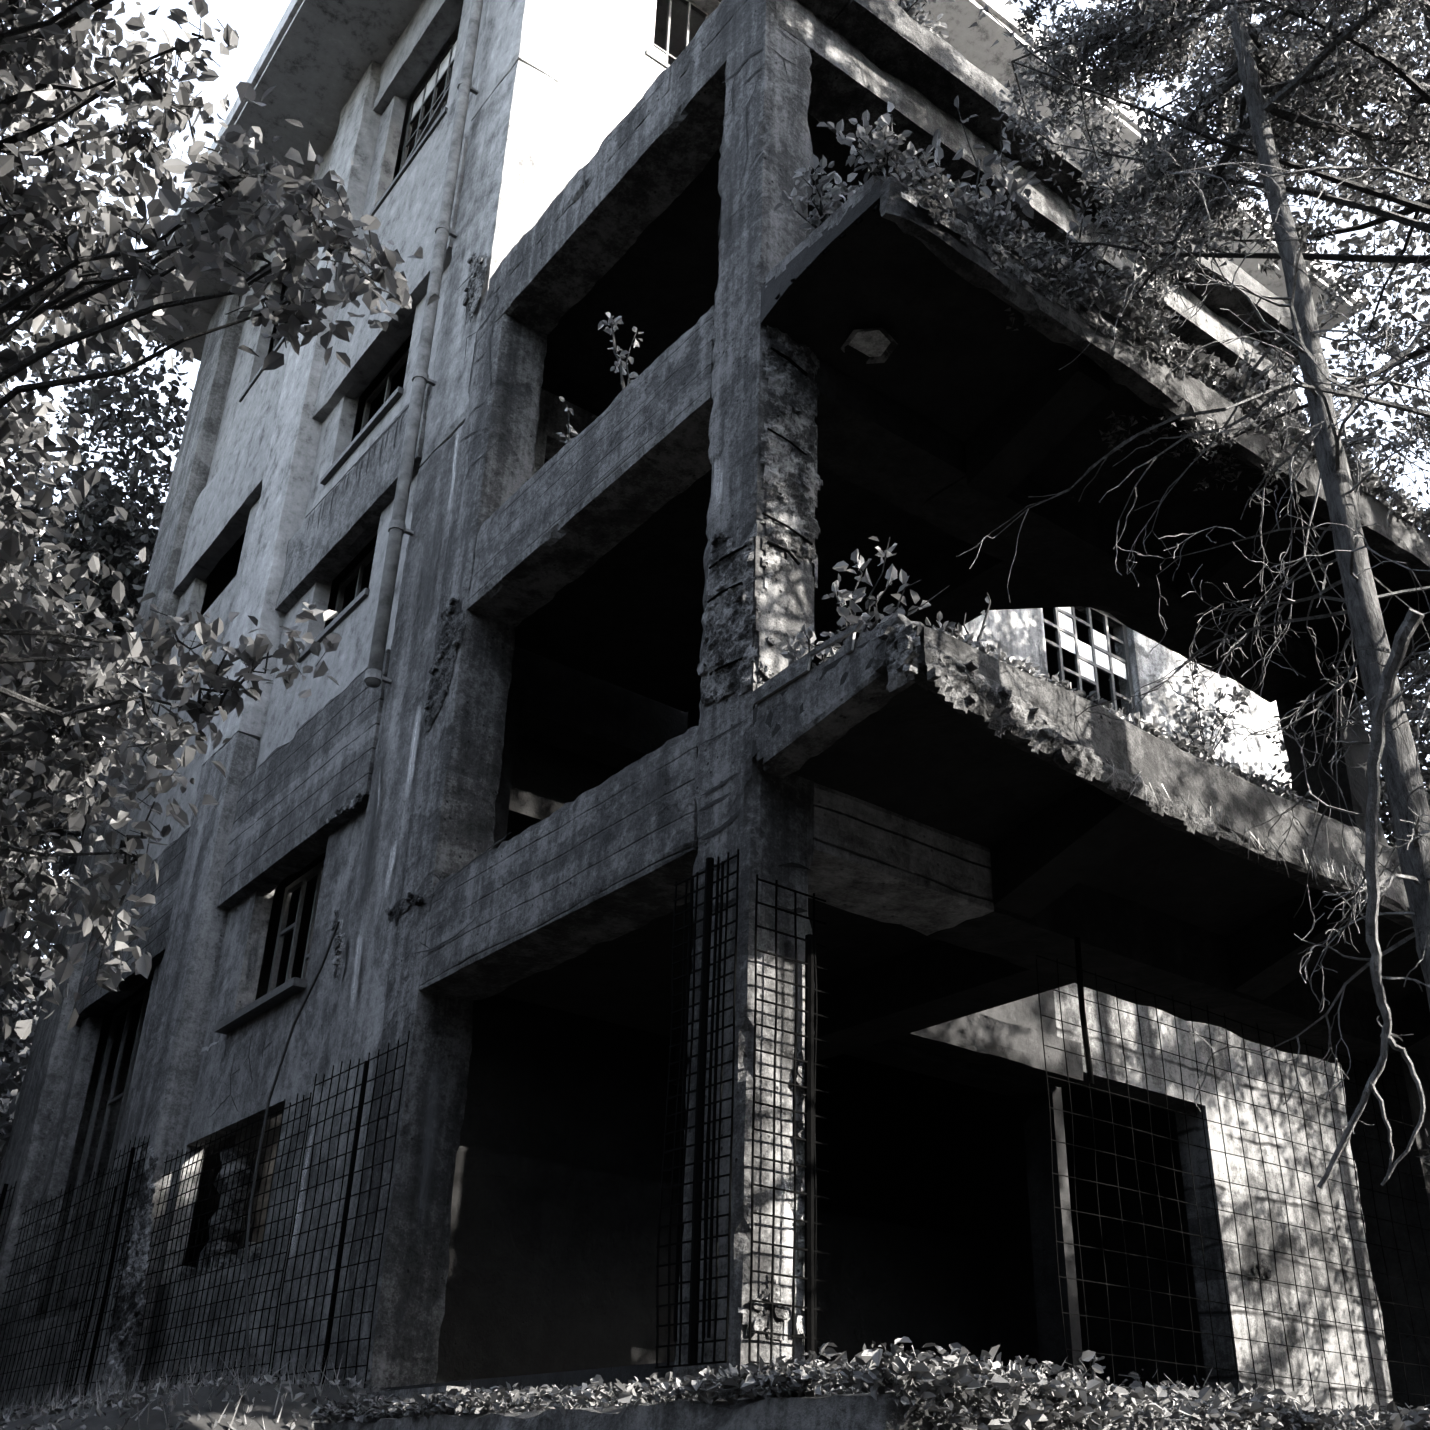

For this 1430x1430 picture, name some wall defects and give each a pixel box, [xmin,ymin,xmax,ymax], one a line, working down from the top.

spalling [424,597,467,733]
spalling [697,324,1242,845]